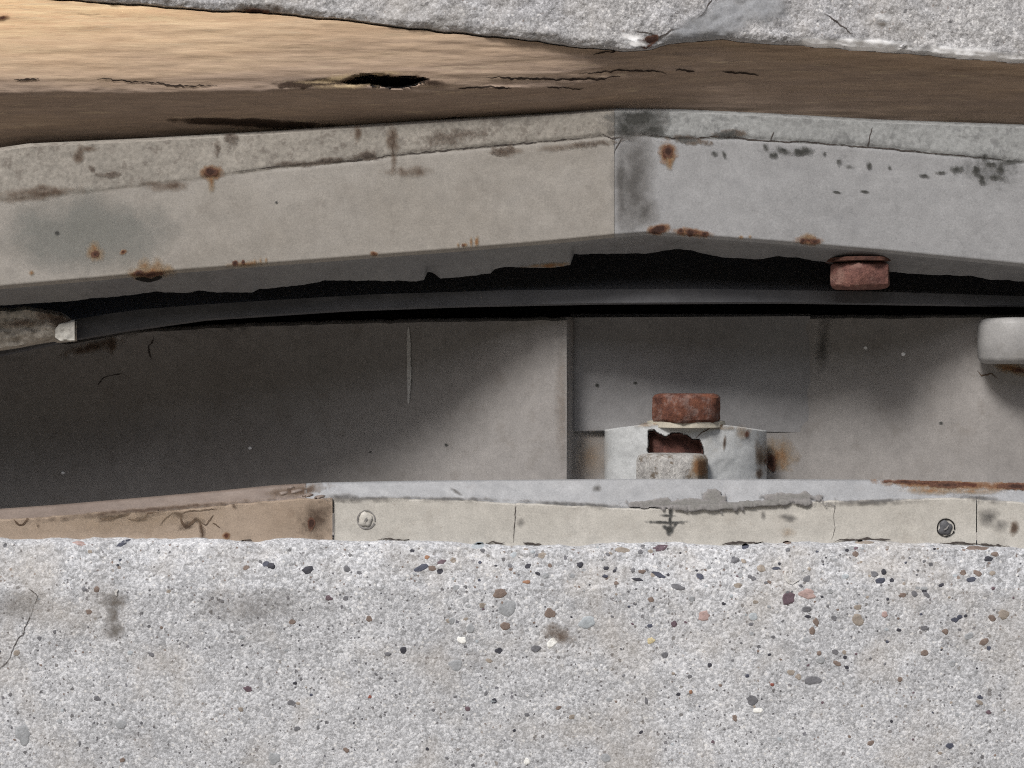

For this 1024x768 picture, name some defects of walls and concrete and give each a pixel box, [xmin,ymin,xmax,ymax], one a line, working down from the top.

rust [200,166,221,188]
damp [616,110,666,222]
rust [660,144,676,168]
mould [763,144,852,167]
mould [919,153,1020,185]
rust [648,224,709,237]
rust [130,262,169,278]
spalling [0,306,116,354]
rust [741,431,788,478]
rust [882,479,1024,493]
crack [99,508,220,538]